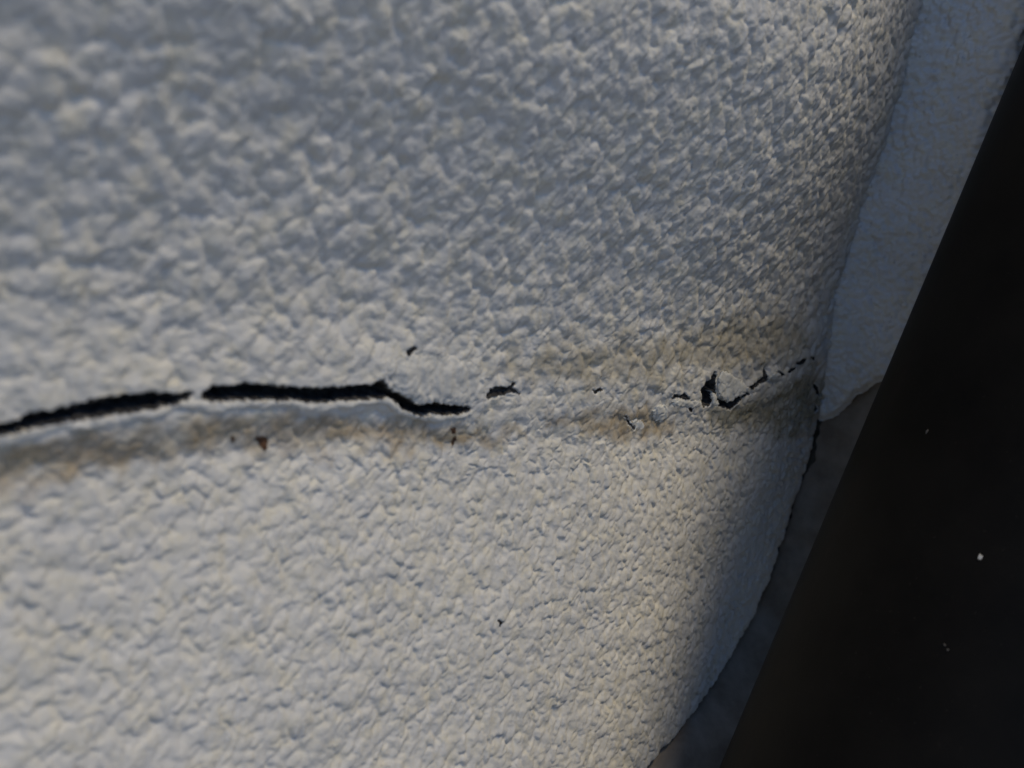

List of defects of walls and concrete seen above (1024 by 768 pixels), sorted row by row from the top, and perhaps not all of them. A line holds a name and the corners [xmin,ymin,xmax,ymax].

crack [0,380,470,436]
crack [624,356,822,480]